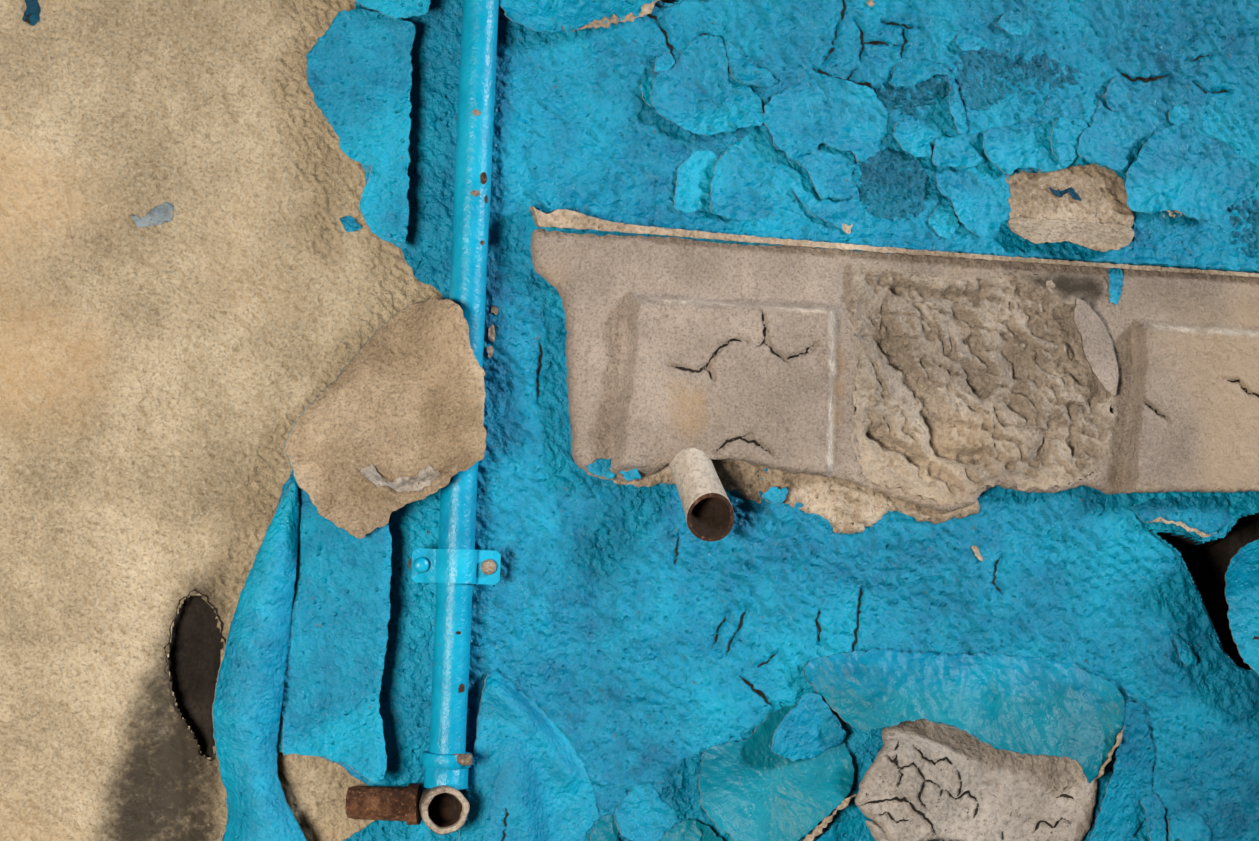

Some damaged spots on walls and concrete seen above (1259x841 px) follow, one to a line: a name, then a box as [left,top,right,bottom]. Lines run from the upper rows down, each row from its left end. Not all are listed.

peeling [306,0,431,249]
peeling [499,0,659,32]
peeling [640,35,1259,252]
peeling [955,32,987,51]
peeling [995,10,1034,36]
crack [673,314,811,380]
spalling [848,263,1119,506]
peeling [277,480,392,841]
peeling [590,648,1212,841]